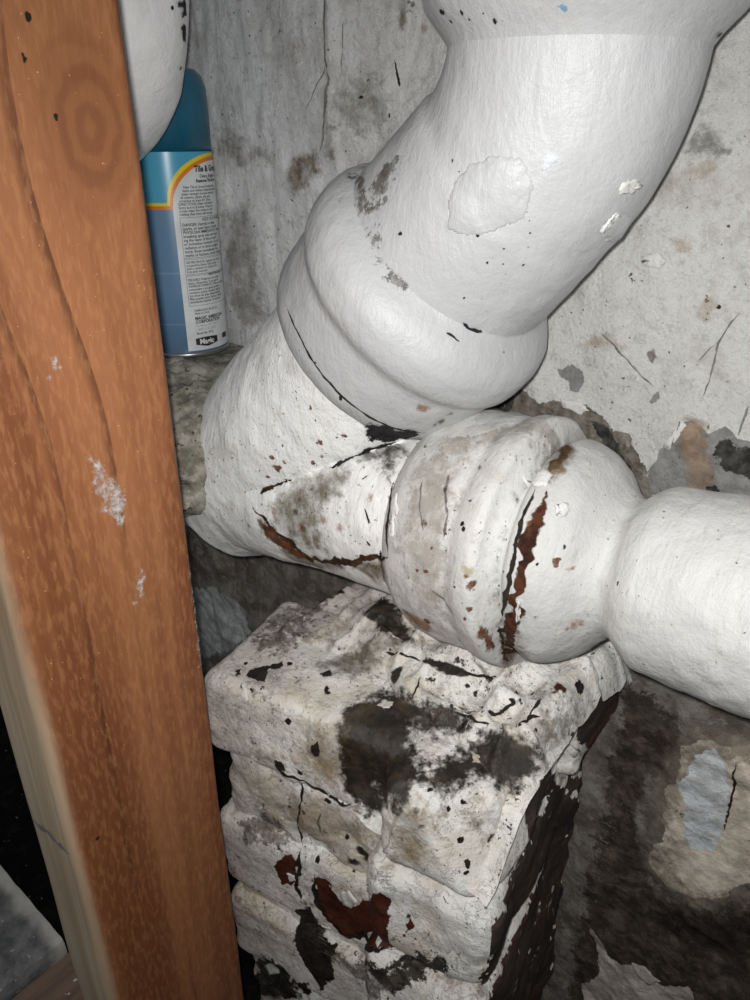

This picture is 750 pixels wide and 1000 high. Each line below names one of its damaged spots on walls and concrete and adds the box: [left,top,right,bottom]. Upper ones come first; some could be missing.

crack [306,0,343,157]
rust [259,455,292,494]
rust [247,508,388,579]
leakage [276,423,419,548]
crack [286,306,420,433]
rust [477,444,575,668]
spalling [487,365,750,499]
crack [274,767,350,846]
leakage [307,667,565,827]
peeling [551,736,588,789]
leakage [563,686,750,1000]
peeling [645,723,750,914]